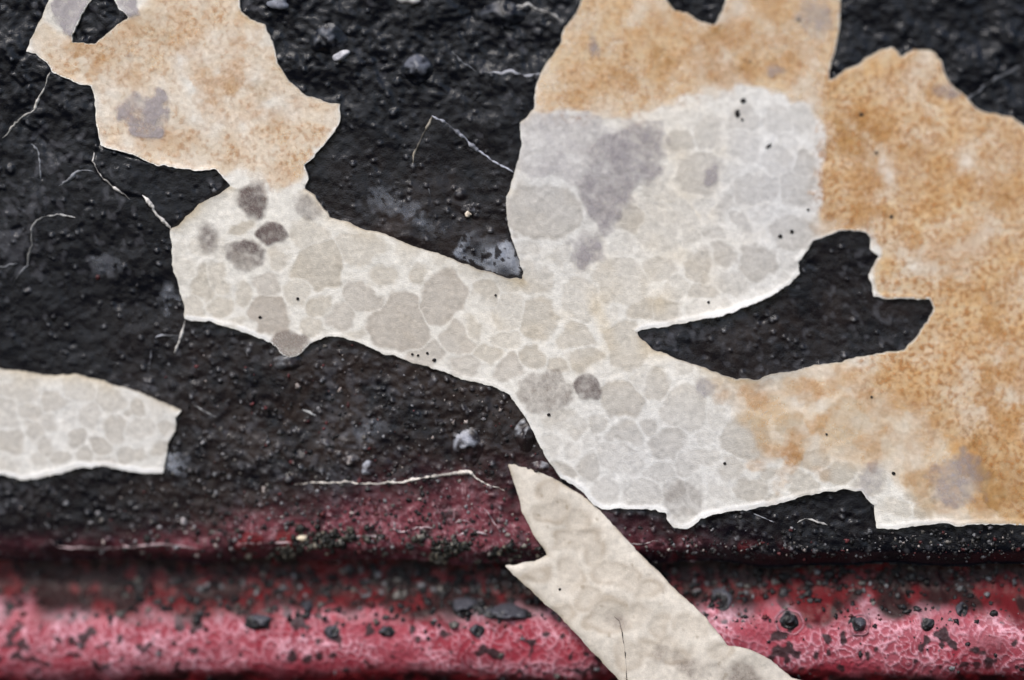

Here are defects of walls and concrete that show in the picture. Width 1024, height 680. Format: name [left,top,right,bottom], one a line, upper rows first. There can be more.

corrosion [546,0,693,108]
crack [3,73,50,138]
crack [32,144,171,229]
leakage [118,88,168,138]
crack [413,116,513,172]
peeling [0,0,1024,529]
corrosion [736,0,1024,524]
crack [296,470,505,539]
peeling [506,464,799,680]